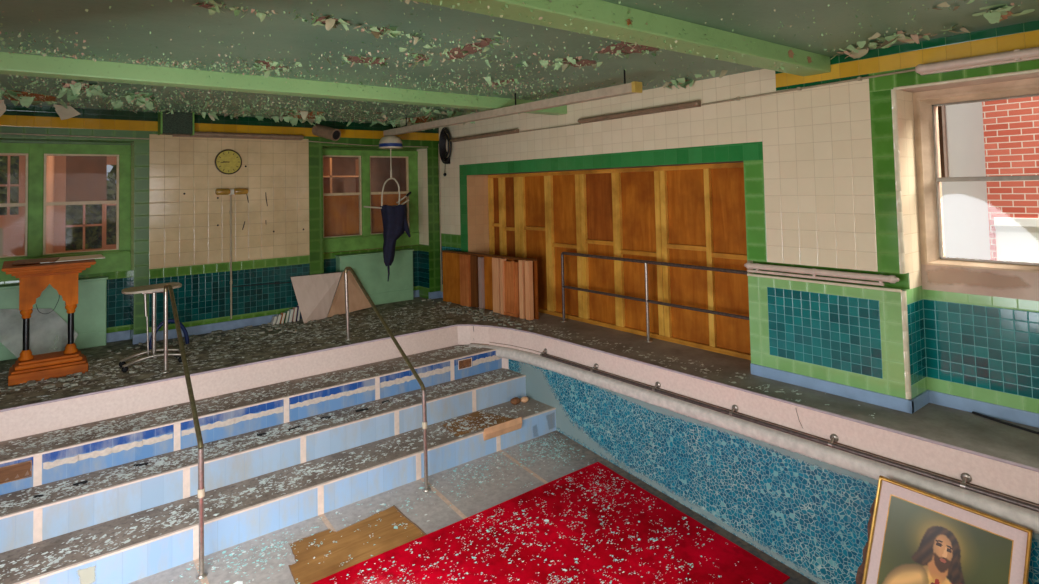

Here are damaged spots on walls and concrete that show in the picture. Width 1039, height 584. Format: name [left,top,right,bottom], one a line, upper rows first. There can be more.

peeling [0,0,1035,131]